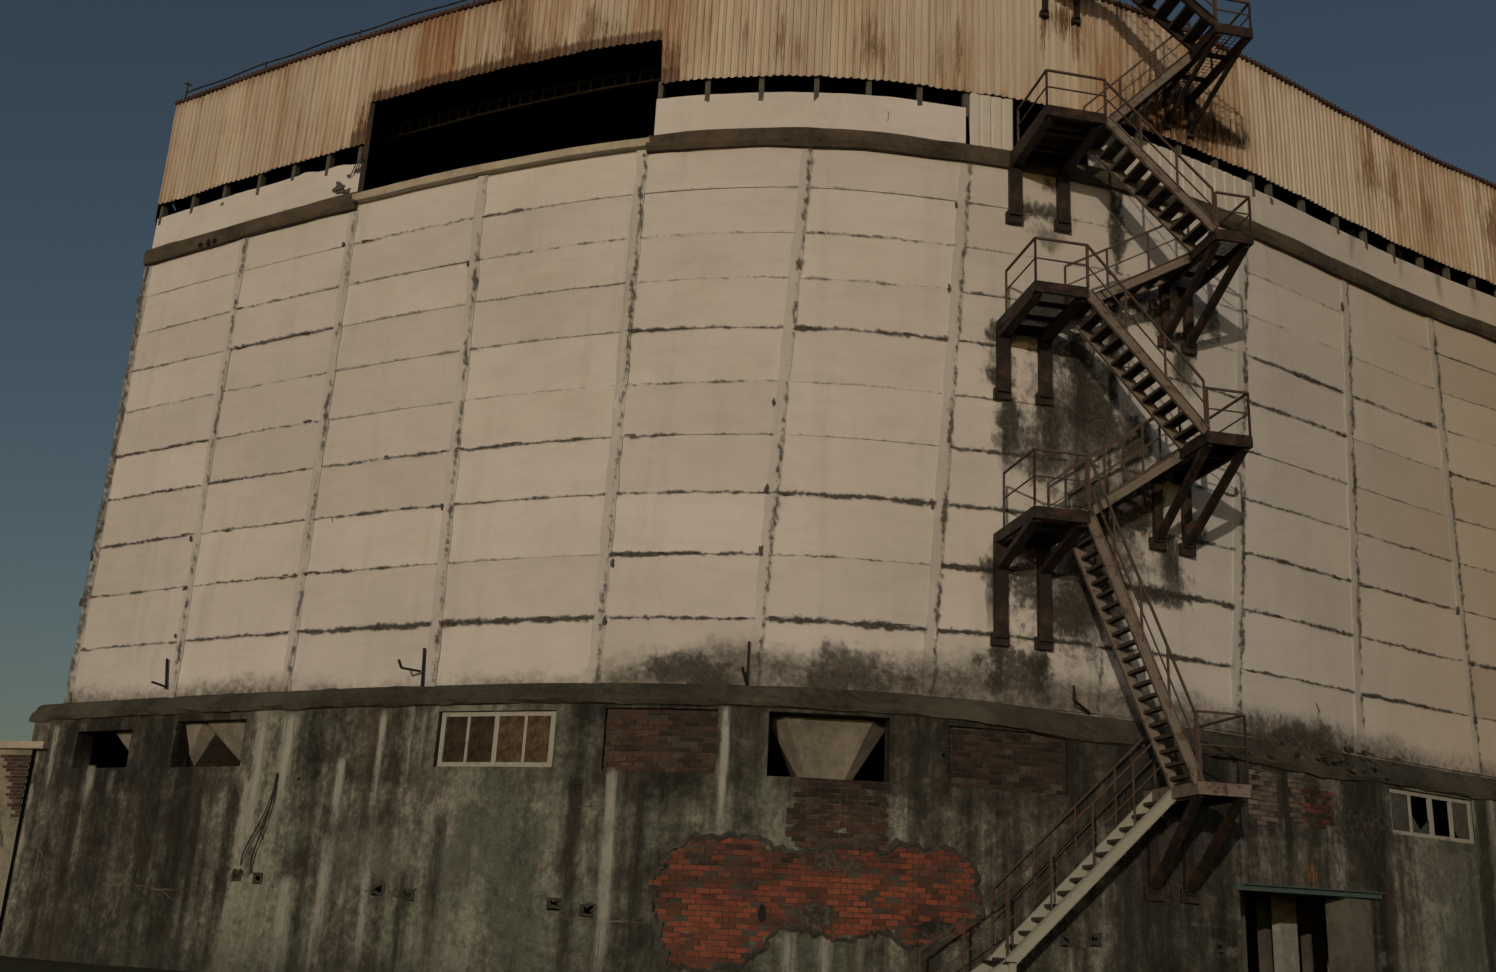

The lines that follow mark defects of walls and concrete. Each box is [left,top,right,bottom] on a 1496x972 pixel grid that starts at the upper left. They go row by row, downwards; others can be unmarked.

corrosion [1040,2,1080,57]
corrosion [1361,126,1398,206]
leakage [1108,188,1128,259]
leakage [979,291,1191,643]
spalling [1341,281,1365,723]
spalling [1234,460,1247,730]
leakage [972,645,1053,696]
flaking render [0,755,32,847]
leakage [211,715,298,923]
leakage [332,759,346,820]
peeling [1242,738,1401,829]
flaking render [649,778,986,972]